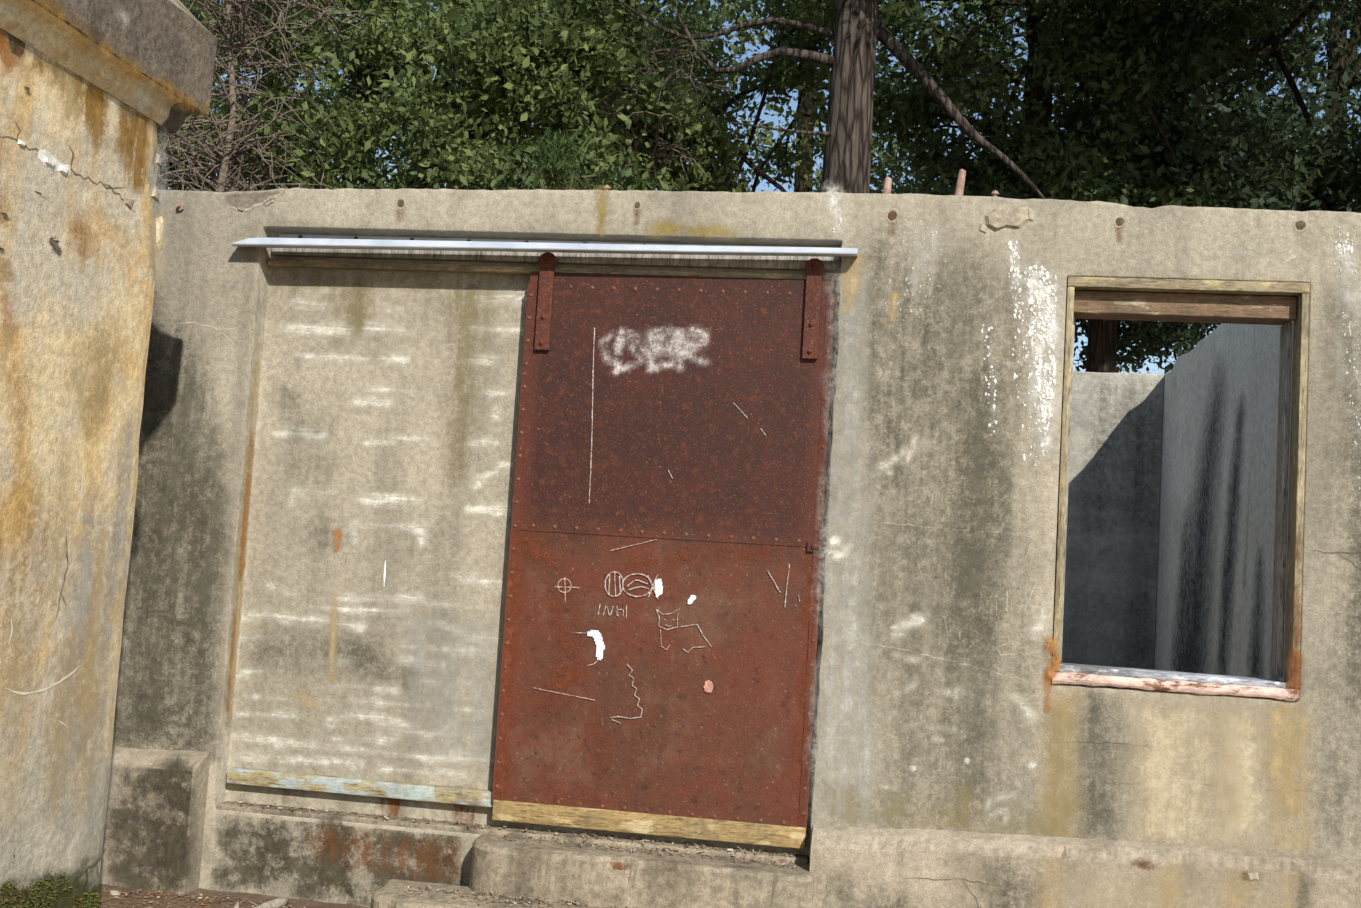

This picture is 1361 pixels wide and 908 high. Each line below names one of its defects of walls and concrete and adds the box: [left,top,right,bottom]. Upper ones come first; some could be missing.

damp [34,57,104,146]
crack [0,122,146,226]
damp [118,103,148,188]
damp [1333,226,1361,490]
damp [54,297,226,892]
corrosion [227,365,257,717]
corrosion [494,530,525,793]
corrosion [1044,637,1060,711]